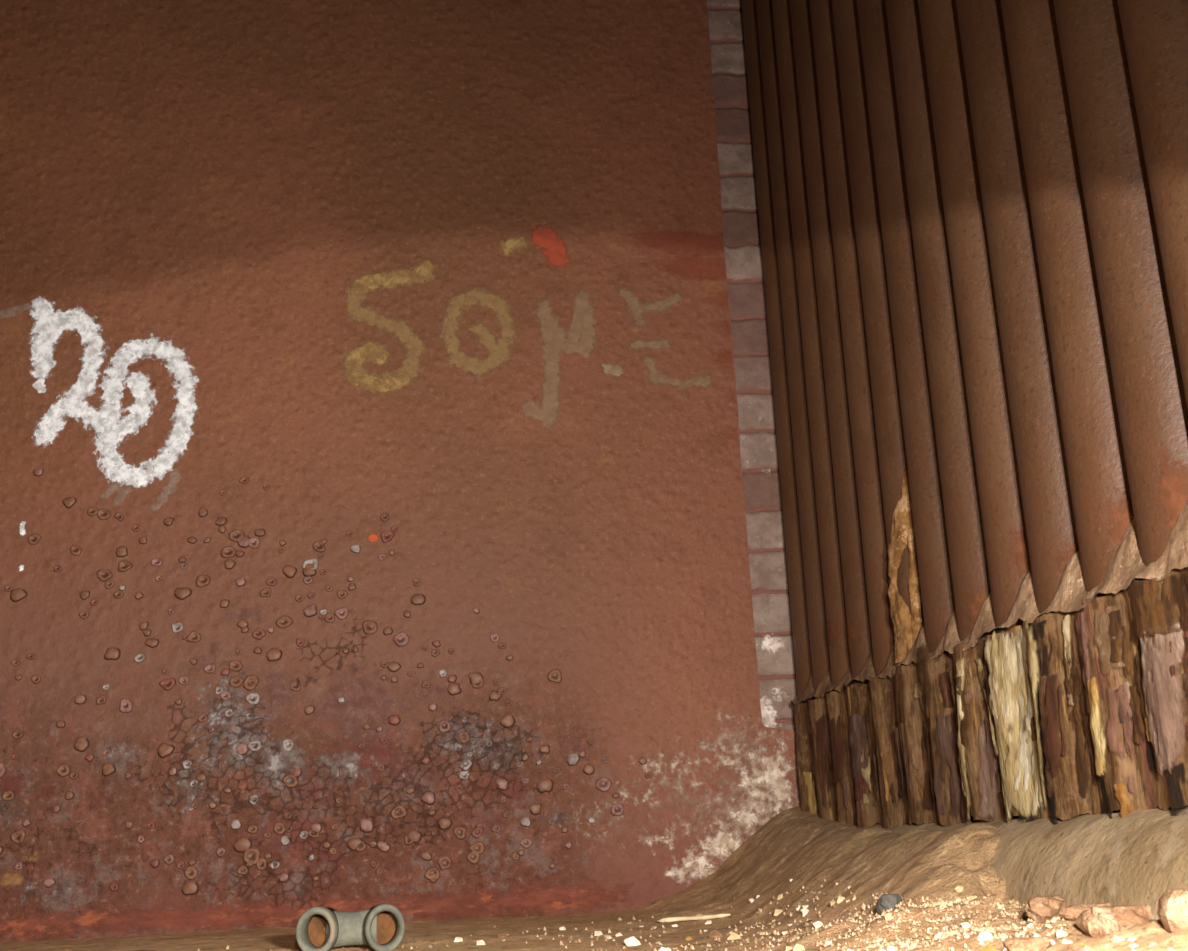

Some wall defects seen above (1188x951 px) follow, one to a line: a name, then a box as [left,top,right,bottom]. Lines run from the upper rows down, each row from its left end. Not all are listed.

damp [644,687,800,884]